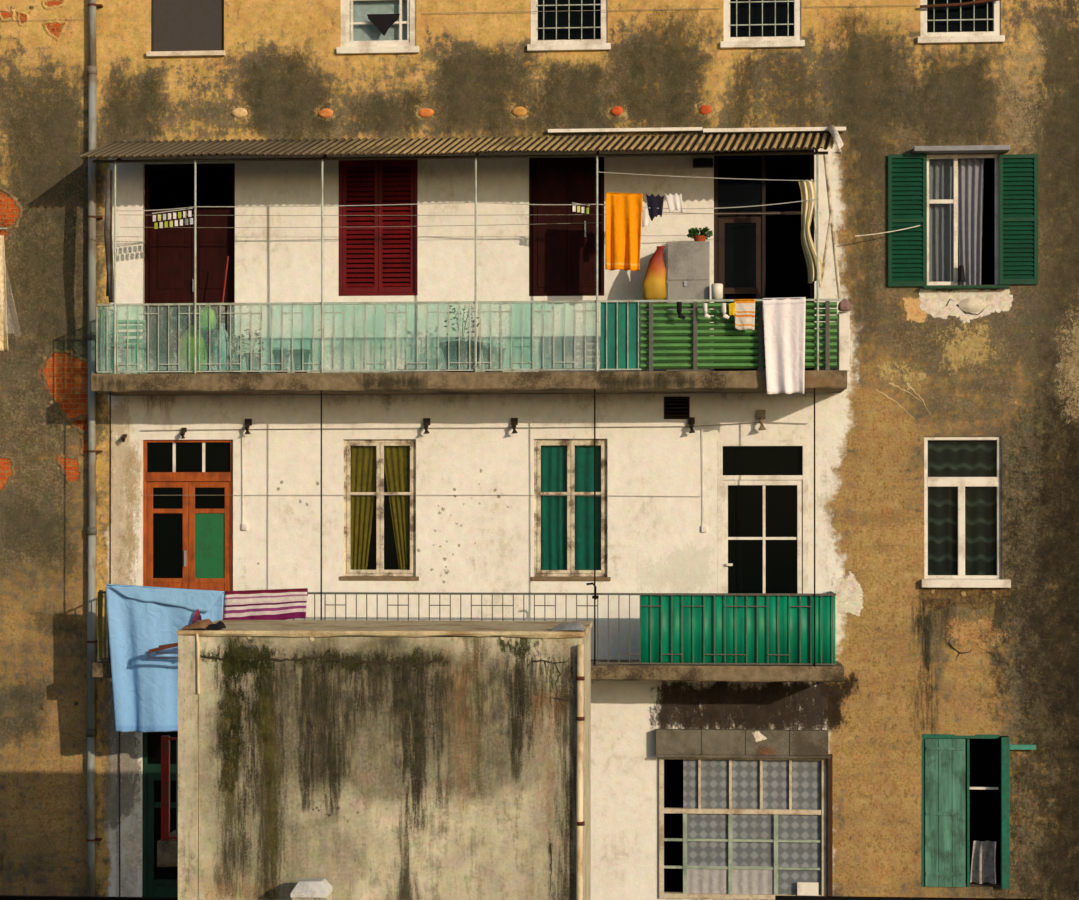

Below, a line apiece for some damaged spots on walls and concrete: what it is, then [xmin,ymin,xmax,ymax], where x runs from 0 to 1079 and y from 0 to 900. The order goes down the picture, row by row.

flaking render [0,0,69,45]
flaking render [0,187,23,243]
spalling [902,289,1013,375]
peeling [875,358,928,398]
flaking render [39,349,88,486]
flaking render [0,454,18,493]
peeling [835,571,864,616]
damp [215,652,453,900]
damp [496,656,585,900]